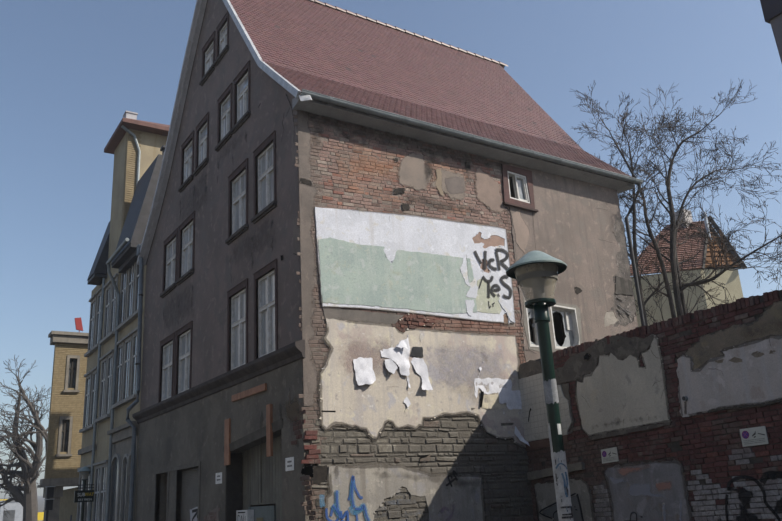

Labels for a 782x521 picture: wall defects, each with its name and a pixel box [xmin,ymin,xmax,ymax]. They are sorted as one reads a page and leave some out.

peeling [394,152,529,254]
peeling [460,255,478,316]
peeling [499,299,515,324]
spalling [604,215,637,327]
spalling [286,389,336,521]
spalling [342,413,516,443]